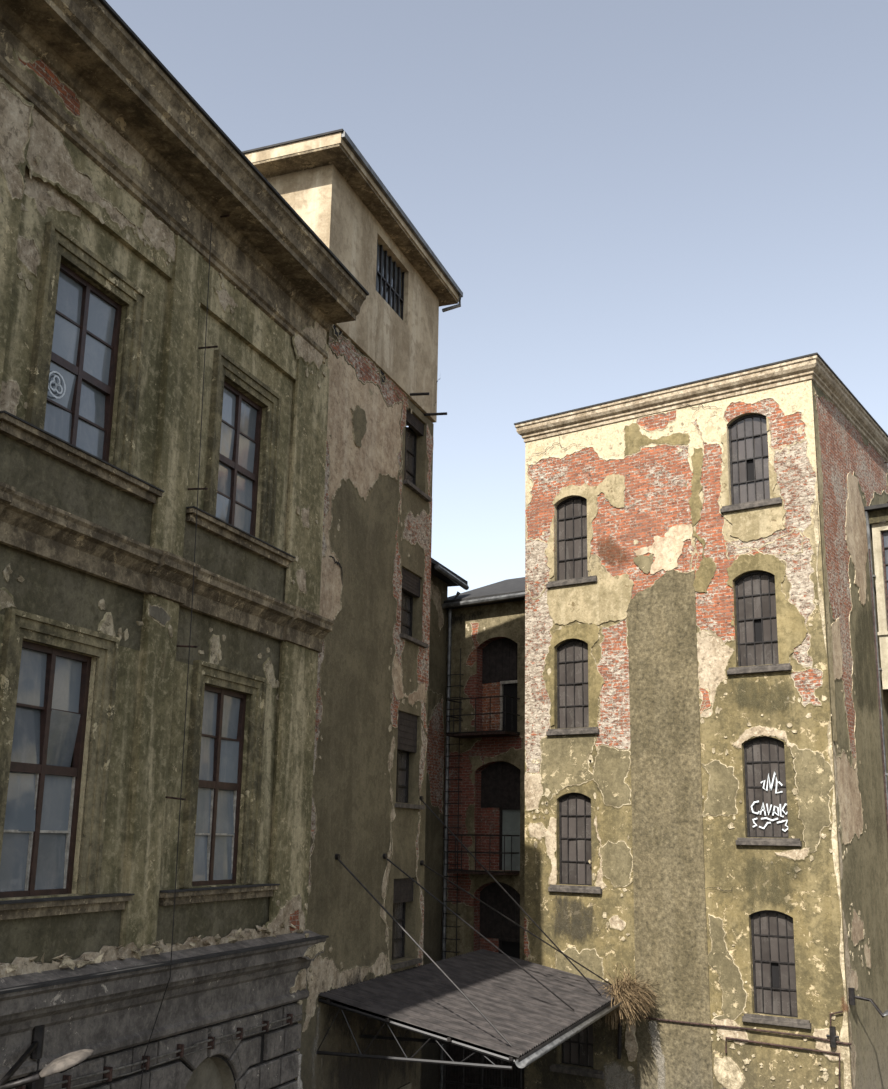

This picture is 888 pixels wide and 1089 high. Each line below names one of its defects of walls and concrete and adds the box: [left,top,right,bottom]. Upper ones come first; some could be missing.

peeling [0,315,445,1034]
flaking render [524,386,888,1089]